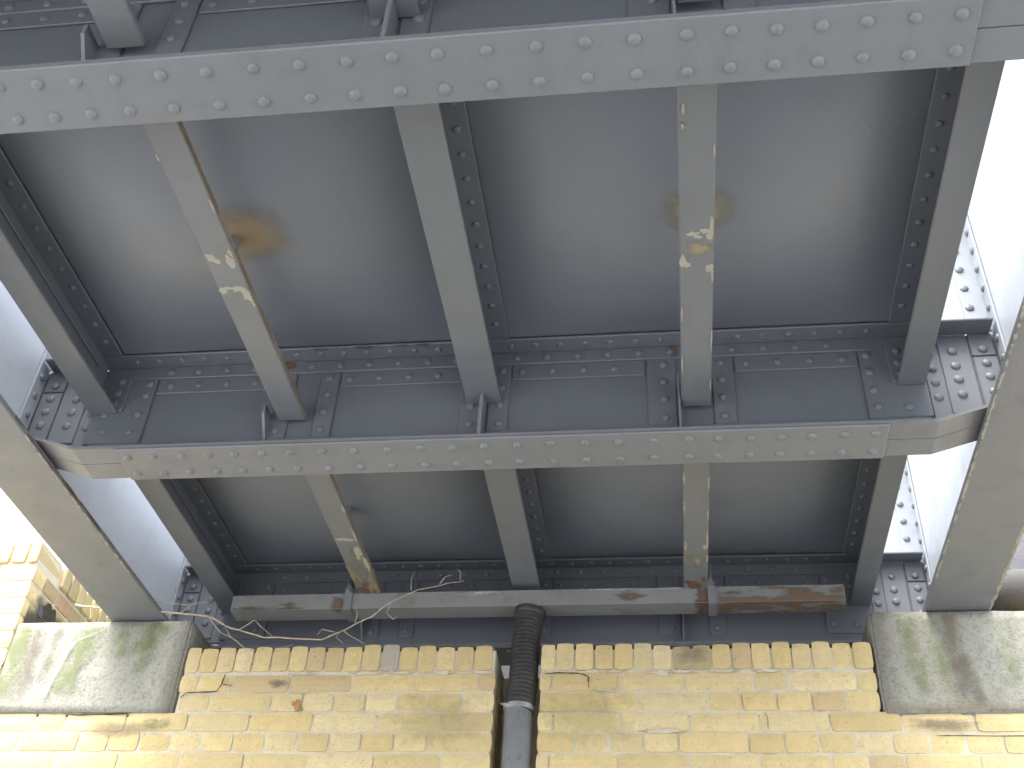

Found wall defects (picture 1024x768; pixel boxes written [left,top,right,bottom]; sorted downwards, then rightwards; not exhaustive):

peeling [205,248,236,269]
peeling [219,285,256,307]
corrosion [178,121,307,417]
peeling [686,217,714,241]
peeling [334,529,377,594]
corrosion [695,586,845,614]
damp [0,624,103,695]
damp [931,614,998,709]